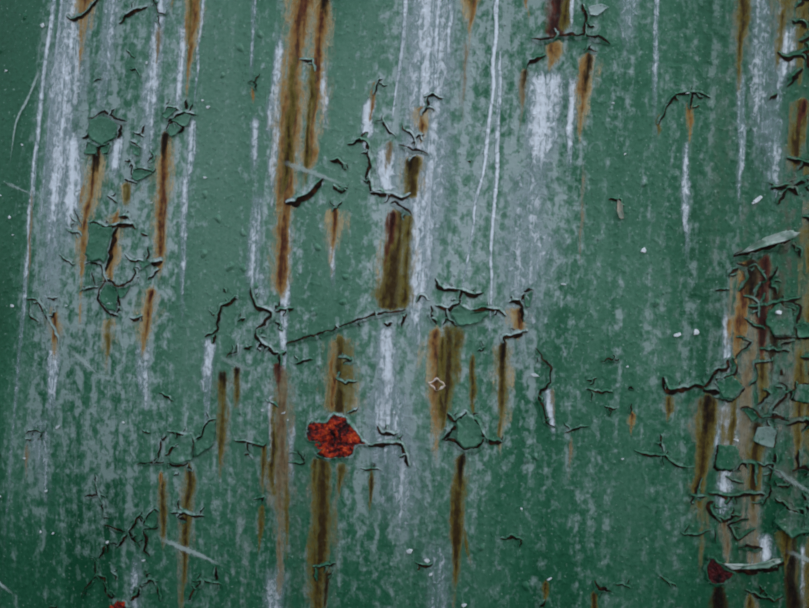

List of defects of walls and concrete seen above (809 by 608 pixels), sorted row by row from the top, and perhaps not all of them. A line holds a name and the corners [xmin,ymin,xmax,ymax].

leakage [22,0,89,319]
corrosion [272,0,332,295]
corrosion [405,156,423,198]
leakage [377,0,454,344]
leakage [462,0,502,331]
leakage [505,71,577,313]
peeling [79,219,164,317]
corrosion [375,209,413,311]
peeling [435,278,534,326]
peeling [733,230,809,340]
corrosion [419,325,477,447]
peeling [713,372,809,489]